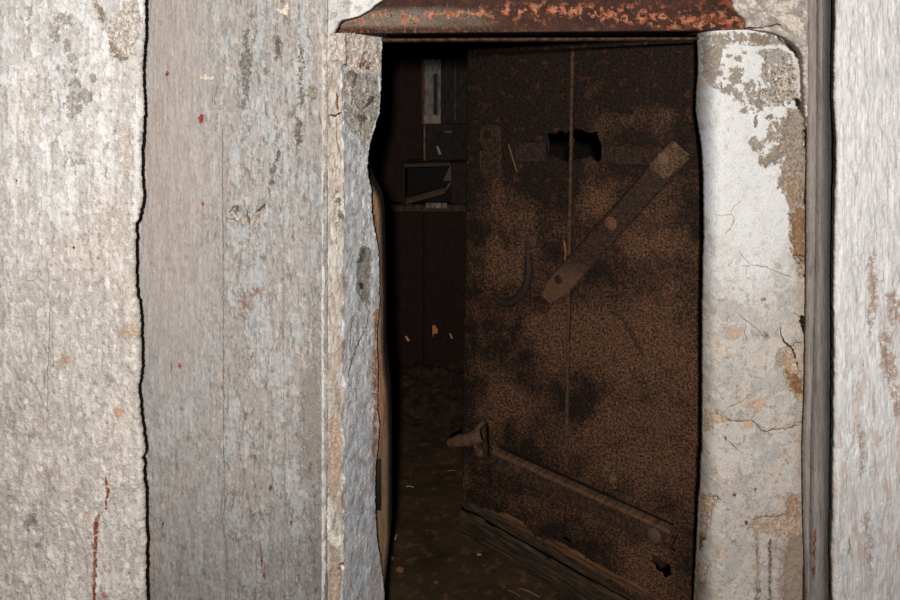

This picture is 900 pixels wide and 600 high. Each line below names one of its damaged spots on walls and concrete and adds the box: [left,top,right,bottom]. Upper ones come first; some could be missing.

flaking render [700,31,805,279]
crack [739,312,804,371]
crack [704,393,799,448]
corrosion [83,477,110,600]